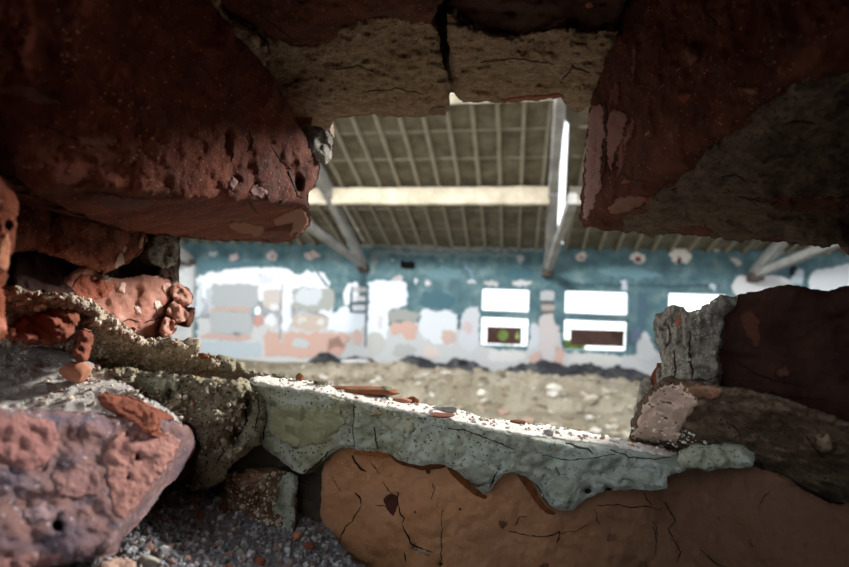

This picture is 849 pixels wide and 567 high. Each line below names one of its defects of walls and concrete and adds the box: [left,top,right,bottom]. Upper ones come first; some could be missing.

spalling [0,0,662,386]
spalling [669,249,692,264]